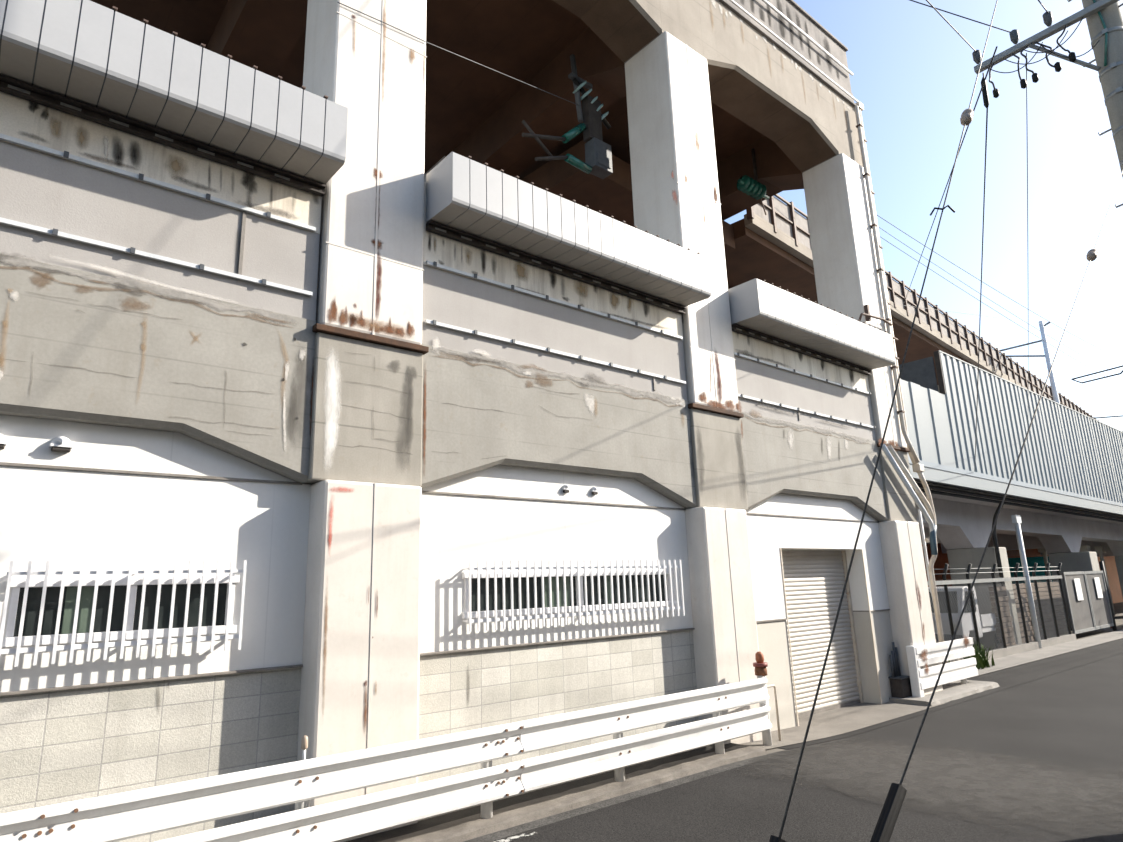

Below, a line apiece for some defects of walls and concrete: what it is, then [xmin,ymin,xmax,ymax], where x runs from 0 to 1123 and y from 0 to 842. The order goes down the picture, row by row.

corrosion [329,240,414,336]
damp [282,338,305,442]
damp [392,363,415,450]
corrosion [699,353,741,413]